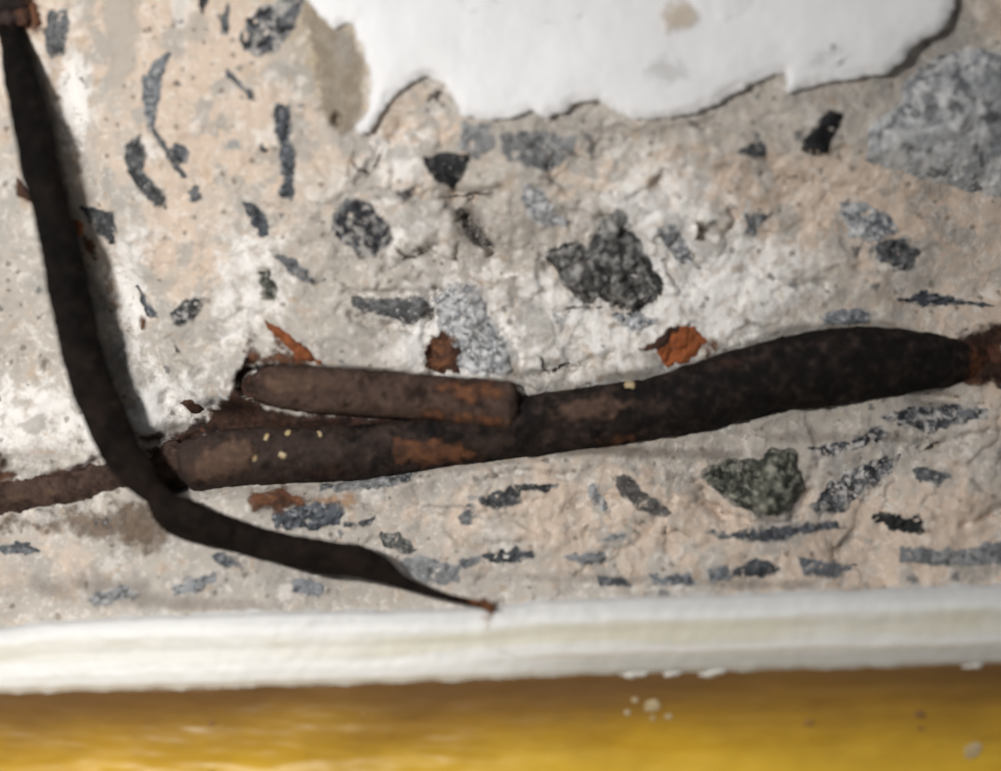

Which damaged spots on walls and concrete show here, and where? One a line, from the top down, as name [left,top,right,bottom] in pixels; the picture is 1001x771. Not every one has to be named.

rust [0,0,46,33]
rust [16,177,29,201]
spalling [24,0,1001,457]
spalling [0,44,105,482]
rust [137,320,402,484]
rust [422,330,509,426]
rust [638,323,718,368]
rust [957,324,1001,388]
rust [0,453,96,502]
rust [247,487,306,514]
rust [393,437,484,470]
spalling [0,376,1001,627]